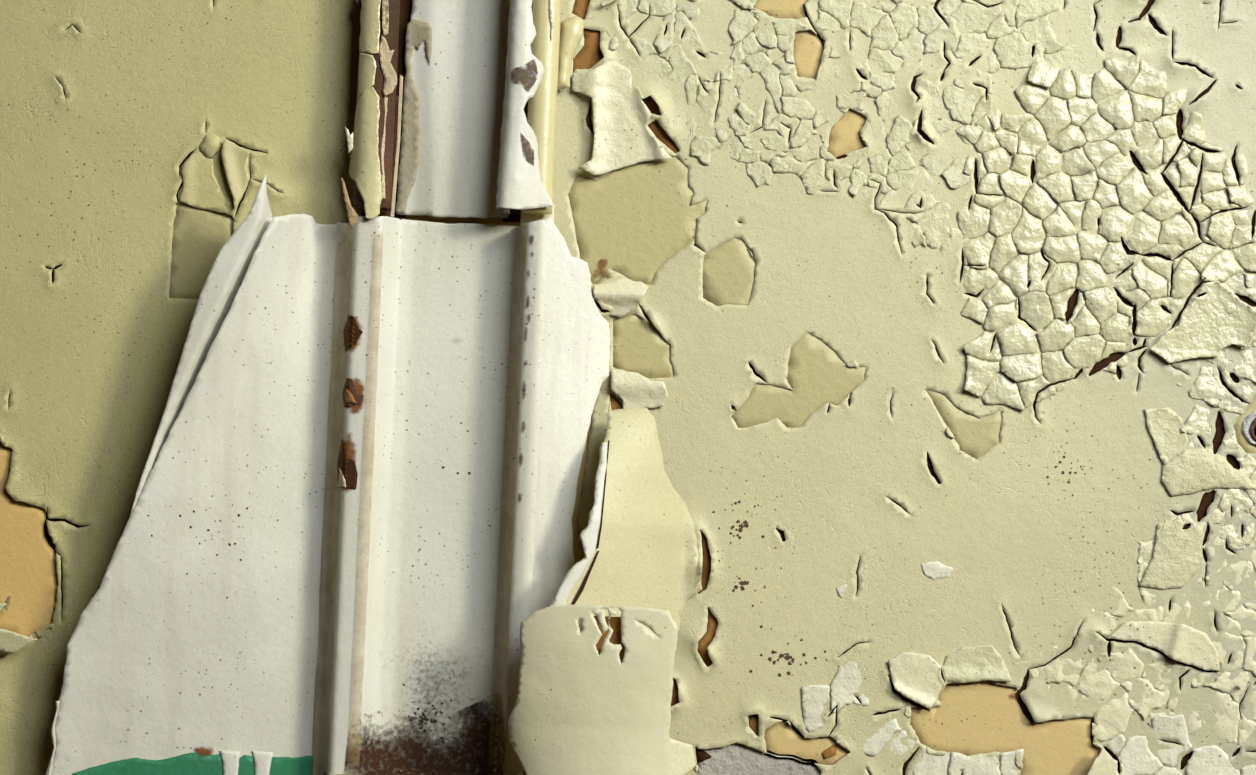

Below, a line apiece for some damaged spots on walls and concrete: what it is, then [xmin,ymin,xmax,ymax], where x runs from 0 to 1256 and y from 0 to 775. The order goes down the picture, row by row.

spalling [361,0,412,218]
crack [911,71,988,145]
crack [176,122,282,215]
spalling [503,209,521,223]
crack [968,158,1003,210]
crack [990,248,1050,352]
crack [1033,0,1256,563]
peeling [558,0,1256,775]
peeling [45,134,364,775]
peeling [0,433,58,654]
crack [1002,606,1084,723]
rust [344,700,504,775]